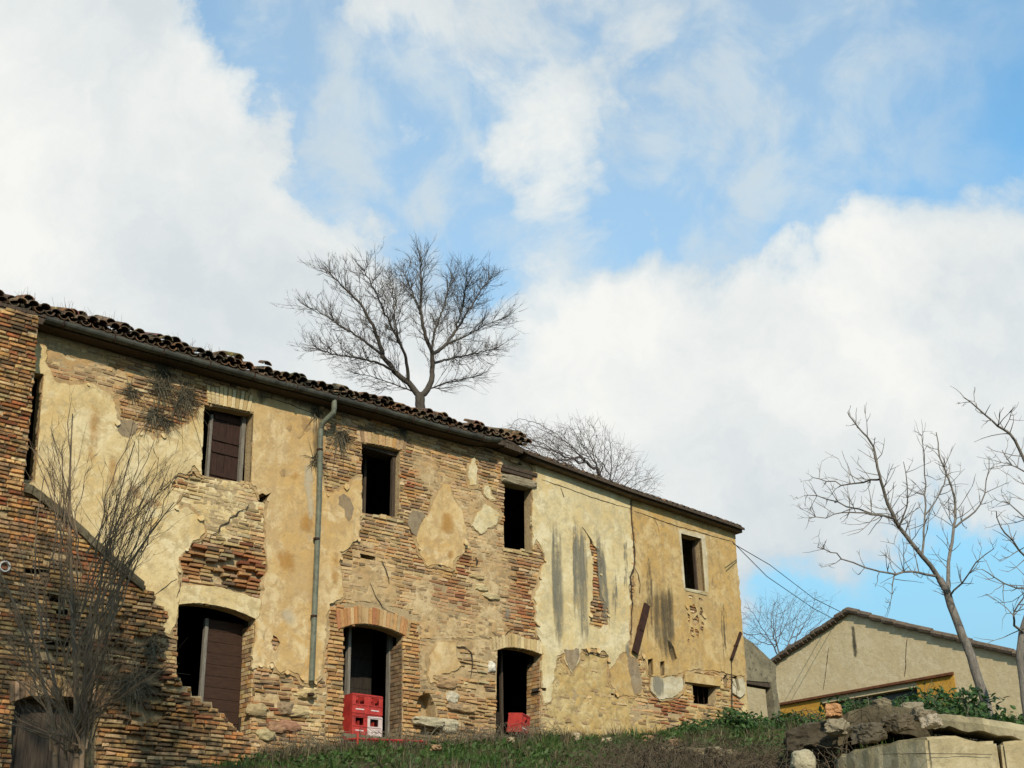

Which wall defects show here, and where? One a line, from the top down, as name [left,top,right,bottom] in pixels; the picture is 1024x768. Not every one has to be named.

flaking render [36,333,247,438]
flaking render [161,624,178,677]
flaking render [170,472,266,598]
flaking render [323,409,547,743]
damp [552,535,628,637]
flaking render [589,541,610,628]
crack [544,480,730,637]
flaking render [531,647,749,738]
damp [647,581,672,645]